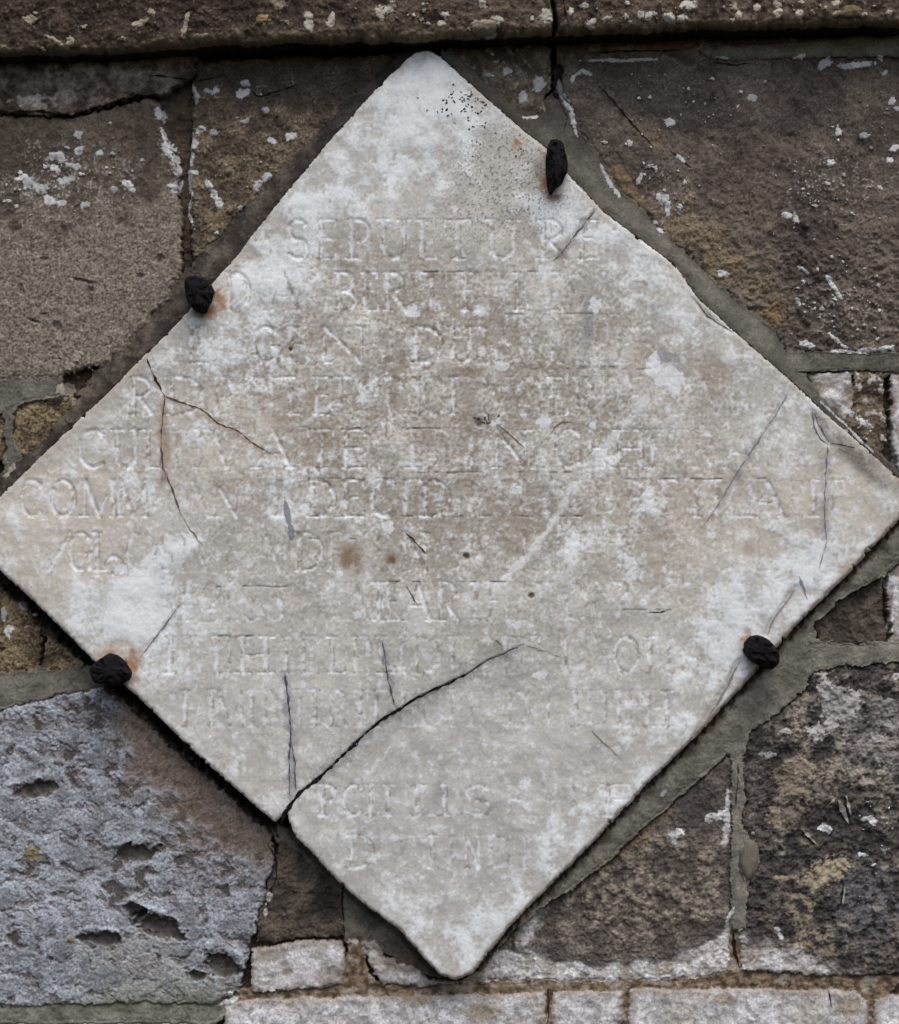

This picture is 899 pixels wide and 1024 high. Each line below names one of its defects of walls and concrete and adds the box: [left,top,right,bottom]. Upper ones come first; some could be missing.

crack [0,74,225,119]
crack [251,84,300,97]
crack [548,0,568,132]
corrosion [187,278,240,333]
crack [147,359,270,544]
crack [701,369,896,528]
crack [812,411,855,568]
corrosion [89,631,151,687]
crack [267,629,562,907]